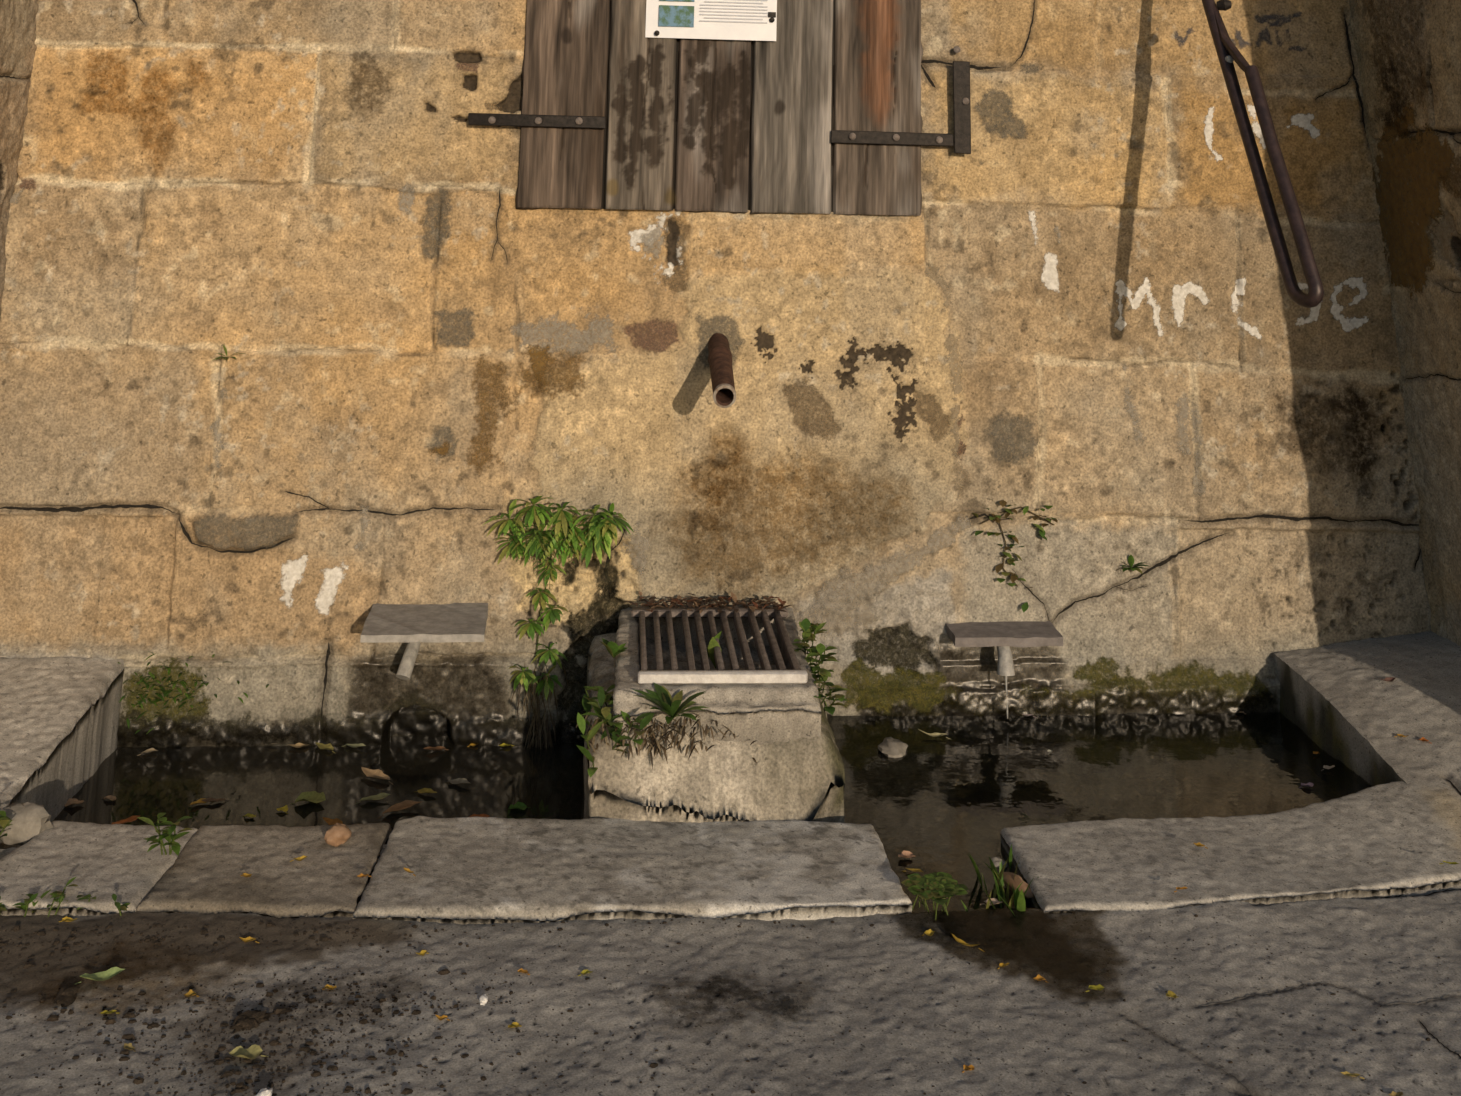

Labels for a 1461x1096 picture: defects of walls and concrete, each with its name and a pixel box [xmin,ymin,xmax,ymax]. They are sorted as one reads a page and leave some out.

spalling [641,218,689,292]
spalling [625,318,678,352]
crack [0,491,494,553]
crack [1012,514,1421,620]
water stain [893,908,1123,1000]
crack [1123,1015,1254,1096]
crack [1195,983,1461,1058]